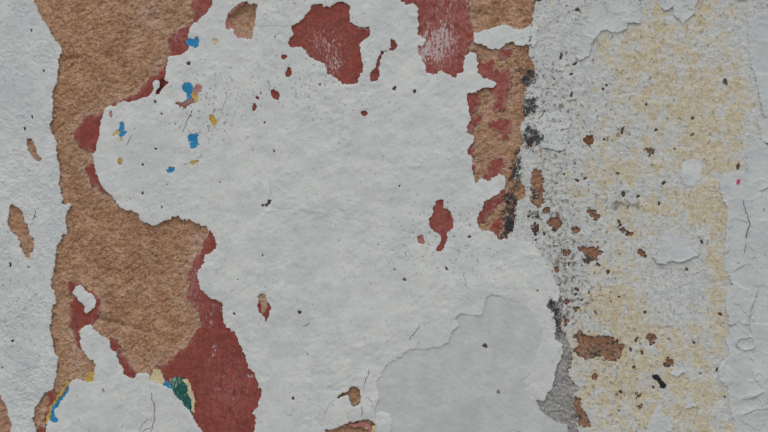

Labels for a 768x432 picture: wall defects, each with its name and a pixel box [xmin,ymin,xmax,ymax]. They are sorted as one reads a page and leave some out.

peeling [281,2,397,85]
peeling [252,89,280,111]
peeling [24,127,42,162]
peeling [8,204,34,268]
peeling [33,0,262,432]
peeling [325,0,768,432]
peeling [257,294,271,321]
peeling [0,396,12,432]